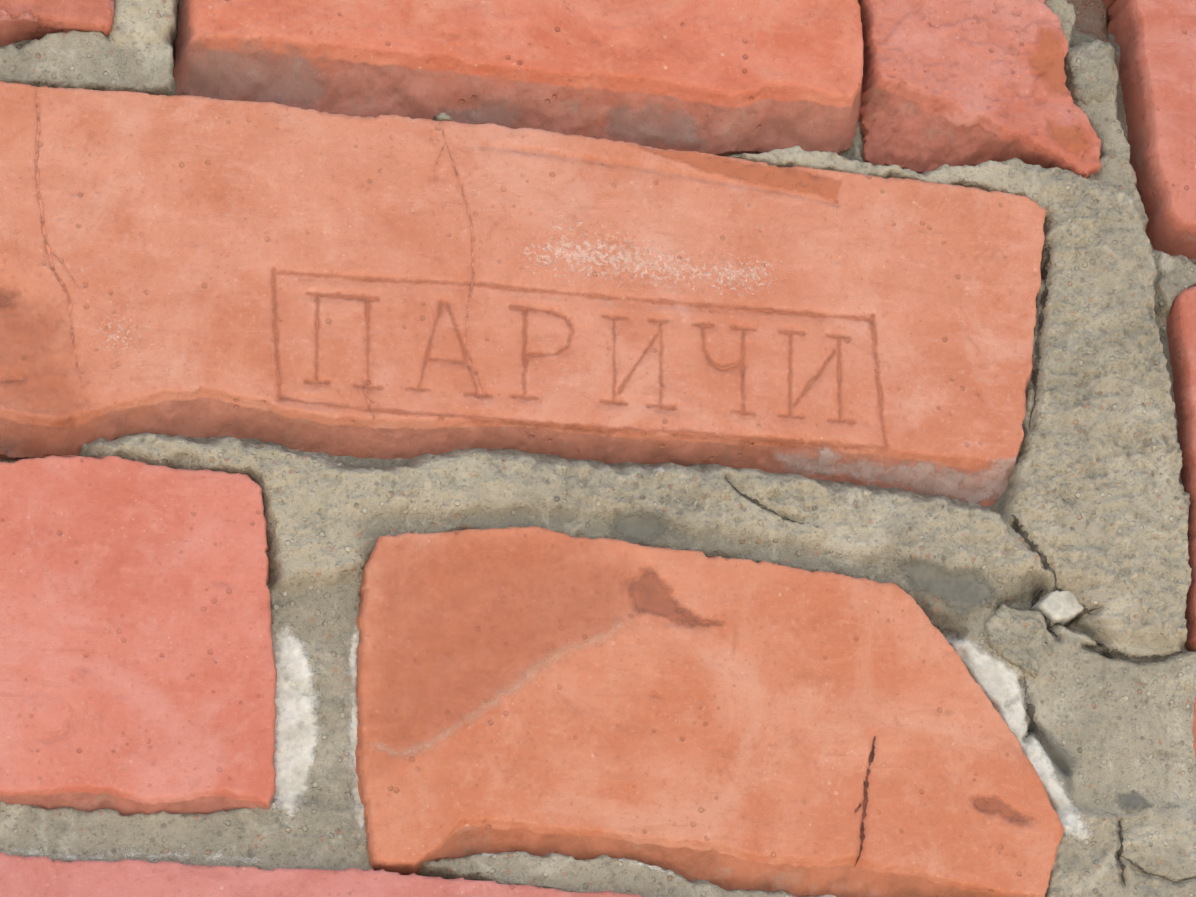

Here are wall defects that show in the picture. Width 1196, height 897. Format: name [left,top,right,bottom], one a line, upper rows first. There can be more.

spalling [0,0,113,36]
water stain [273,627,318,816]
water stain [348,633,364,827]
crack [855,736,876,866]
water stain [944,634,1091,839]
water stain [1119,793,1148,812]